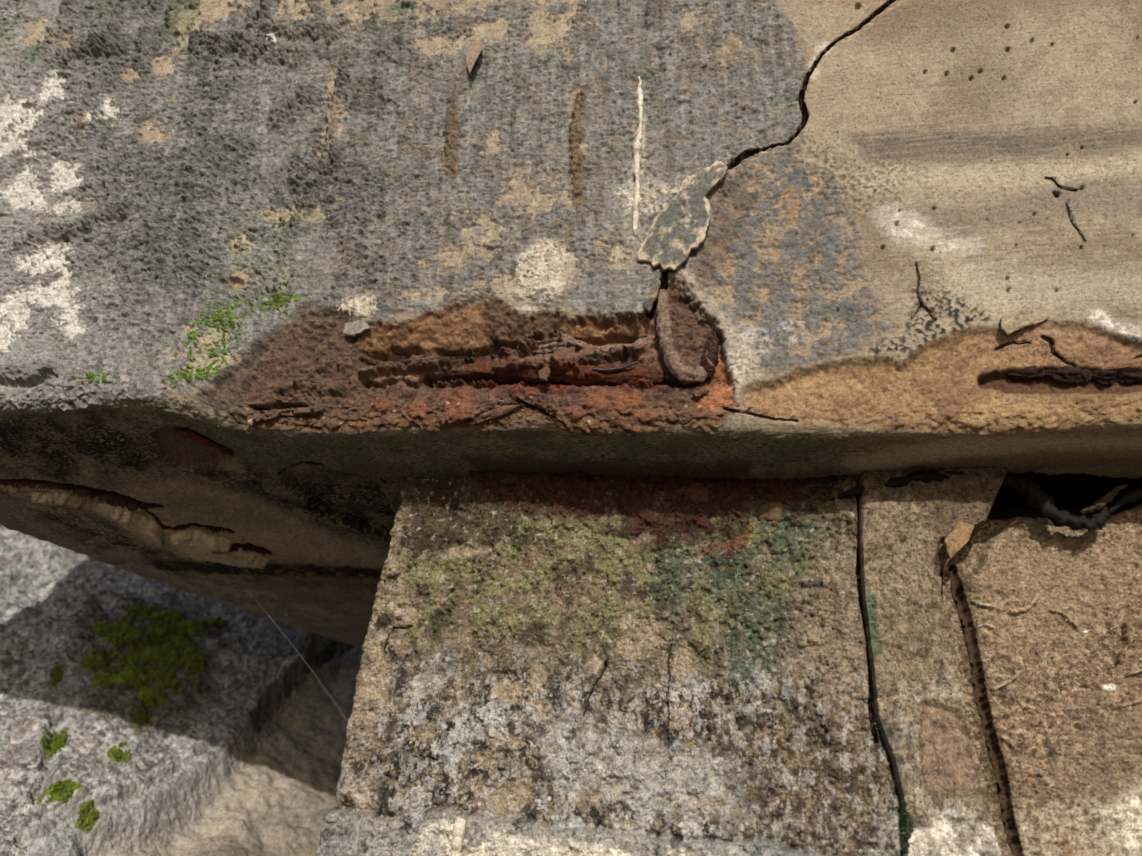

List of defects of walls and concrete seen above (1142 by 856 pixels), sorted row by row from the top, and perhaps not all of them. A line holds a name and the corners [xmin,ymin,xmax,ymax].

crack [726,0,897,169]
crack [647,271,668,318]
spalling [239,161,1142,438]
crack [856,495,919,807]
crack [949,568,1024,856]